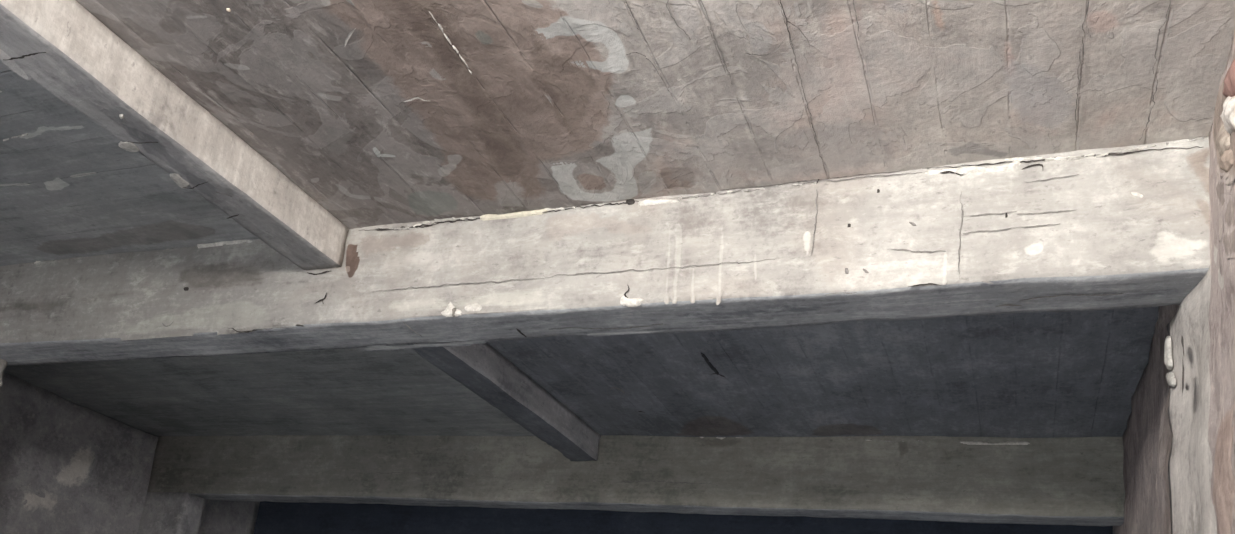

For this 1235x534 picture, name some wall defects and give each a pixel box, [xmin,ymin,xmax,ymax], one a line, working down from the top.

crack [8,52,46,60]
peeling [520,0,633,75]
damp [306,0,697,304]
peeling [372,94,863,230]
crack [532,0,1202,307]
corrosion [344,242,361,279]
crack [359,218,481,231]
damp [716,222,726,305]
damp [801,229,814,257]
crack [701,352,726,378]